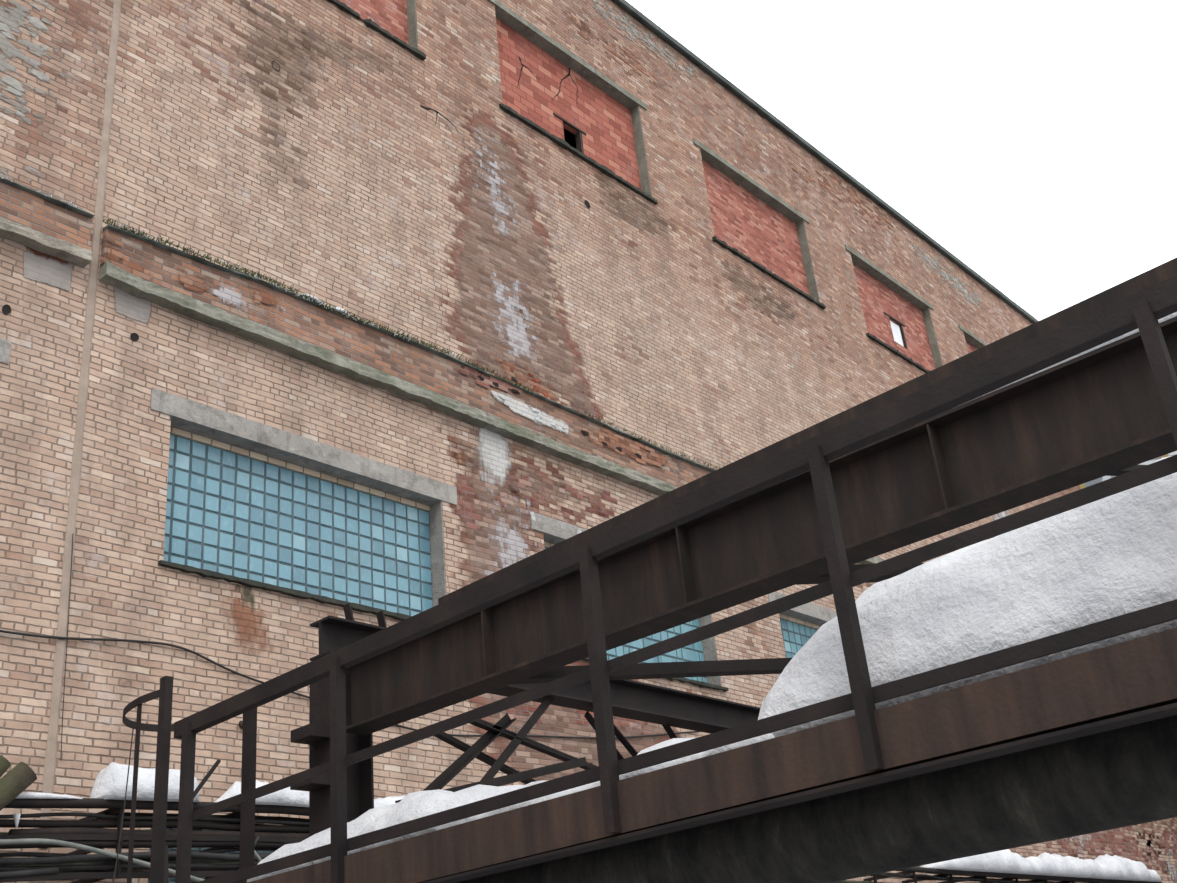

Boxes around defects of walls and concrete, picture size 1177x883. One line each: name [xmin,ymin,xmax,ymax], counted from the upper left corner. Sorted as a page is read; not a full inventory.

peeling [0,0,65,130]
leakage [247,0,381,145]
crack [518,56,578,100]
leakage [444,109,603,422]
efflorescence [479,427,511,484]